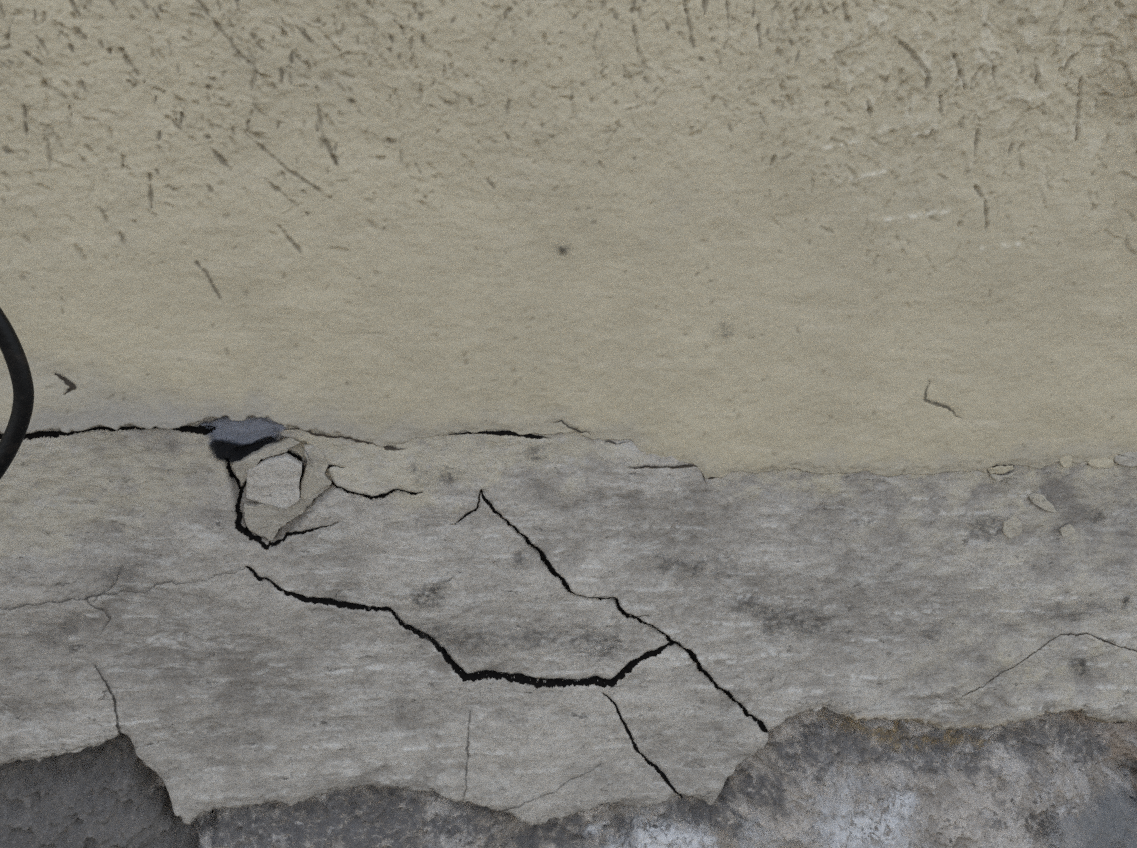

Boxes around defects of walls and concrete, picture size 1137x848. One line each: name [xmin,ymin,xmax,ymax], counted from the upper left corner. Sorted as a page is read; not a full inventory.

crack [0,425,215,440]
spalling [201,417,332,541]
peeling [987,465,1014,481]
crack [95,665,124,738]
crack [225,420,768,798]
crack [962,633,1137,697]
spalling [0,734,508,848]
spalling [517,721,1109,848]